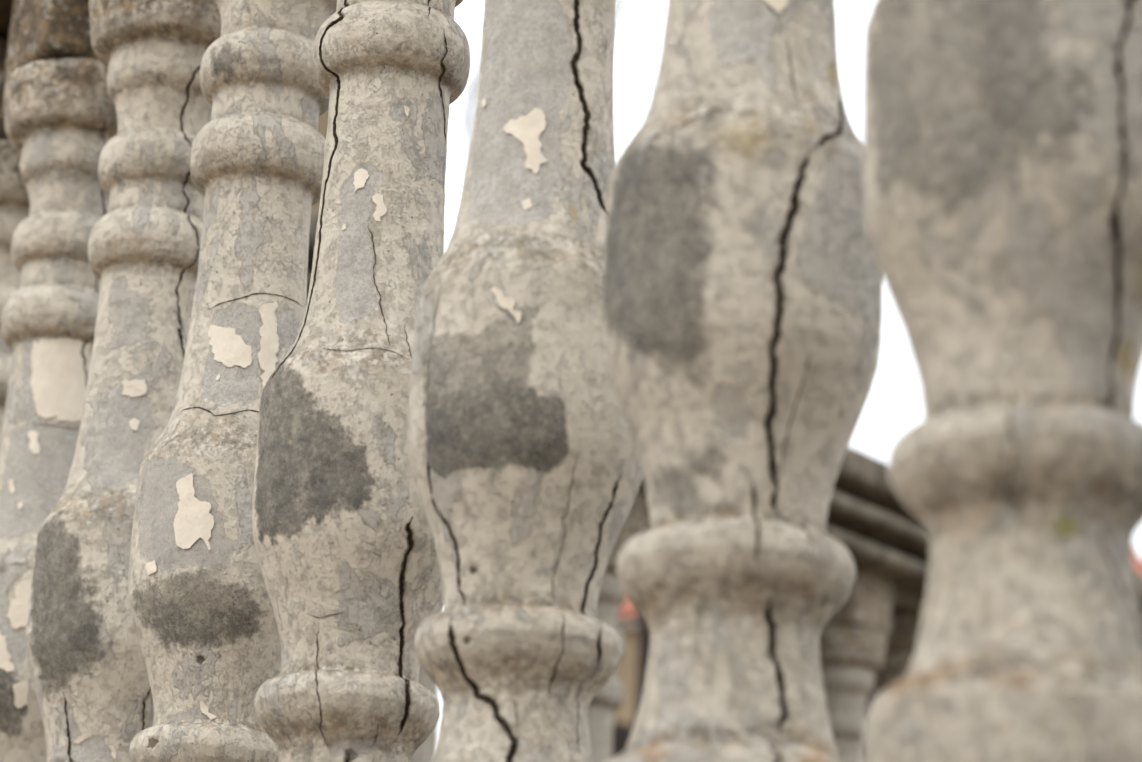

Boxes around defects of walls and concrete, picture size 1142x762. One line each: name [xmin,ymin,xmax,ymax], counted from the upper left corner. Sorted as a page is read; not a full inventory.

peeling [467,0,574,226]
crack [572,0,608,215]
peeling [96,379,234,575]
peeling [203,302,298,407]
water stain [254,366,375,544]
crack [211,0,518,762]
water stain [425,370,569,479]
water stain [604,144,711,370]
crack [751,93,844,561]
water stain [143,594,260,646]
crack [549,451,621,757]
crack [766,597,788,762]